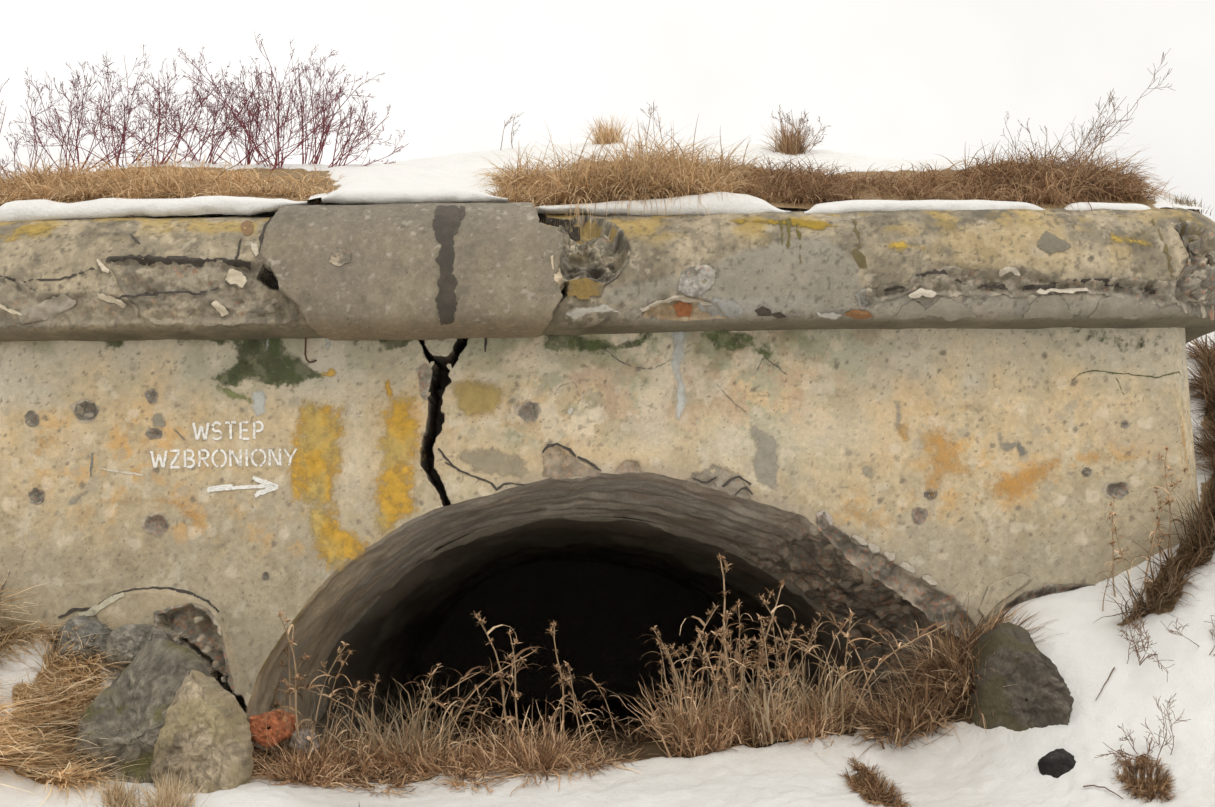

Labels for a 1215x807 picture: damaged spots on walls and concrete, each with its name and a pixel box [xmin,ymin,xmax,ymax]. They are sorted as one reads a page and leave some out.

spalling [0,235,304,329]
damp [432,205,466,325]
spalling [551,215,631,319]
spalling [817,220,1215,322]
crack [415,338,525,507]